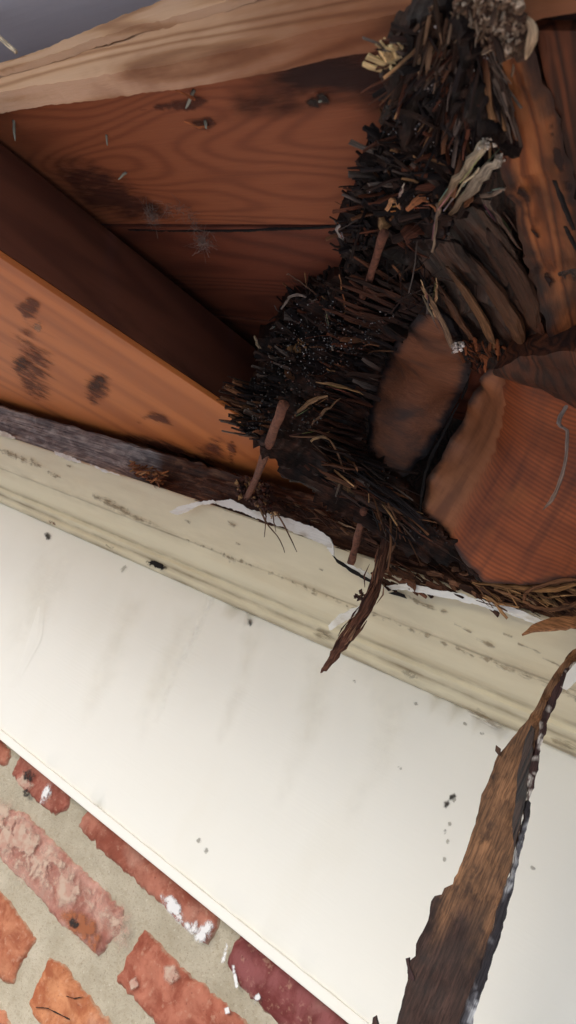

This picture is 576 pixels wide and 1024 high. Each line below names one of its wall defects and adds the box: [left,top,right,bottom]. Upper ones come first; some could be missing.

damp [17,299,39,318]
damp [14,334,51,398]
damp [88,377,108,404]
damp [148,413,169,424]
damp [126,436,236,468]
peeling [170,499,334,556]
peeling [328,605,360,630]
peeling [384,583,542,624]